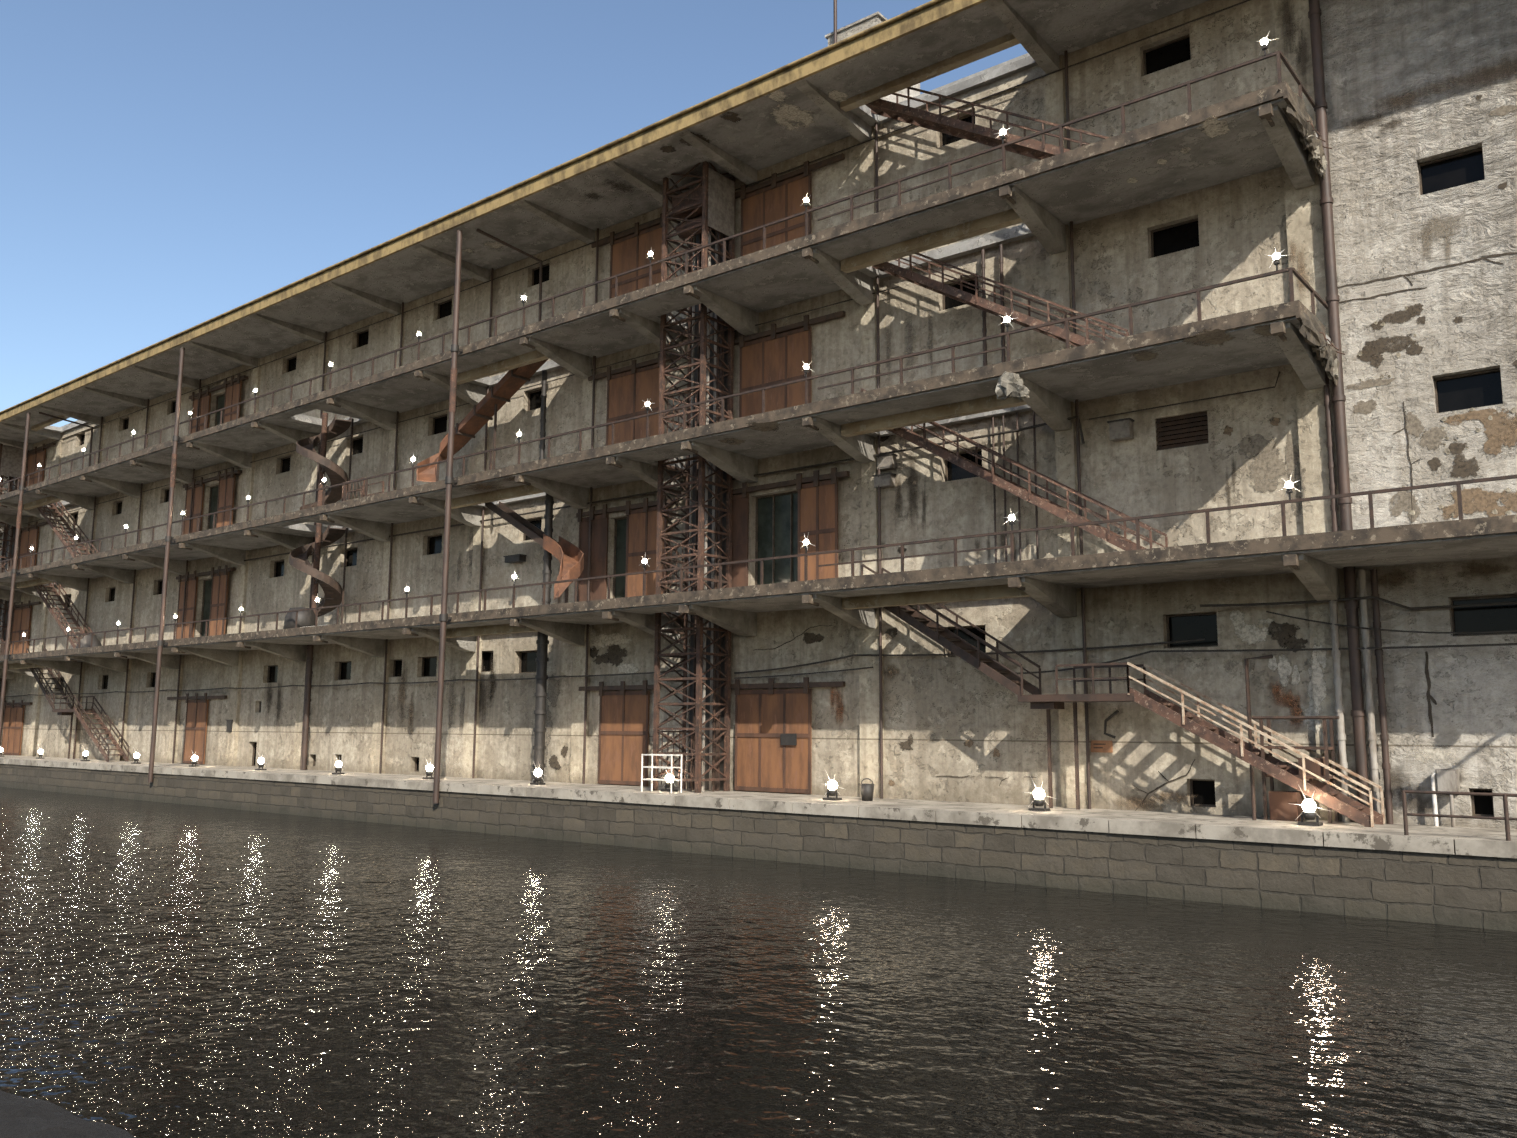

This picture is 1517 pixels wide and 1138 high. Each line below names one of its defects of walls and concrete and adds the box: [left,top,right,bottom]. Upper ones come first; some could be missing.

spalling [1299,303,1426,415]
peeling [1223,417,1306,516]
peeling [1389,486,1421,522]
peeling [1406,407,1517,520]